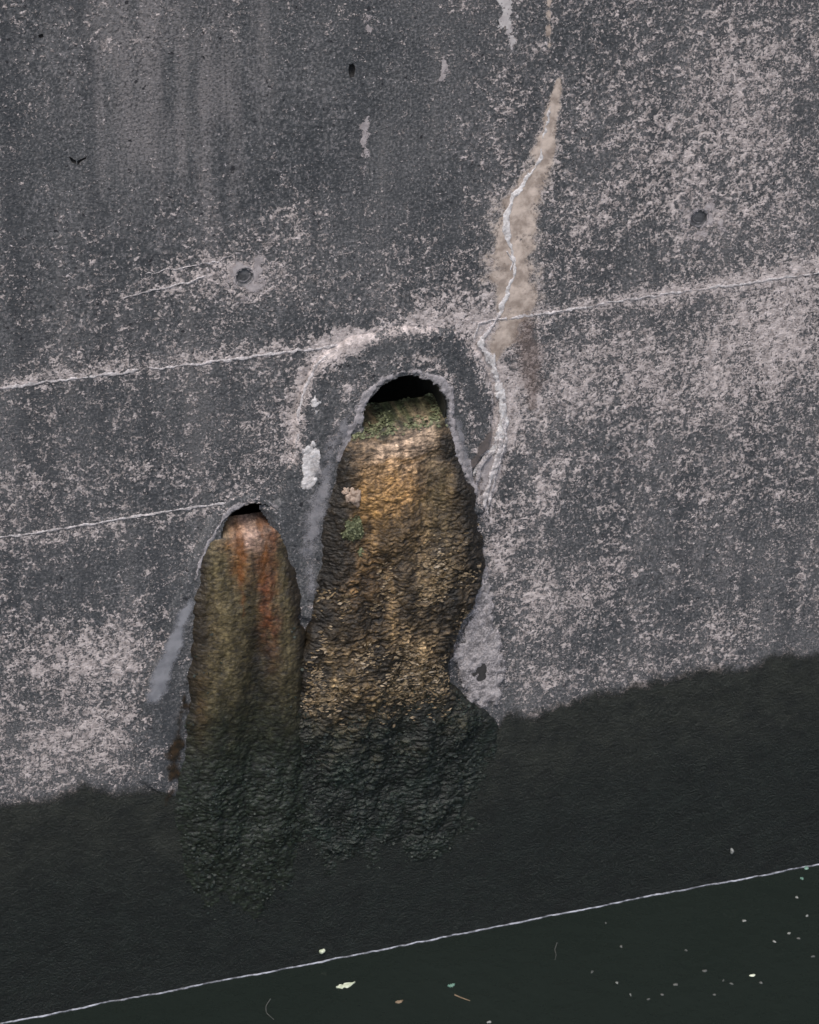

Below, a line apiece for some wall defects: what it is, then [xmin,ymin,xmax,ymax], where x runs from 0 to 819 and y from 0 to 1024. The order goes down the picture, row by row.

water stain [296,351,333,419]
crack [473,107,551,531]
water stain [481,78,562,362]
water stain [0,393,819,1023]